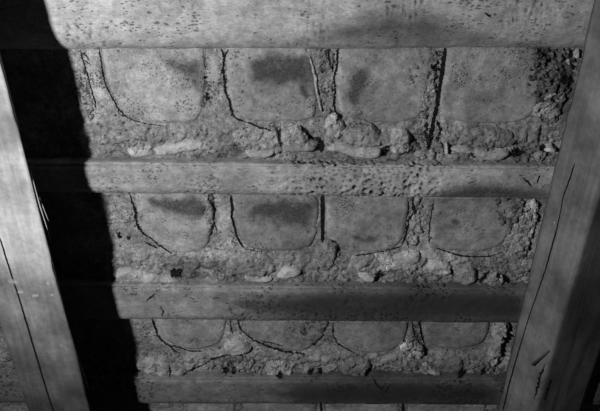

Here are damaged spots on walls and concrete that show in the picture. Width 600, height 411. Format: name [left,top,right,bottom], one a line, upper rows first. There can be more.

damp [252,57,307,97]
damp [349,70,365,103]
damp [152,199,203,215]
damp [253,203,311,224]
crack [503,163,575,409]
crack [0,239,54,411]